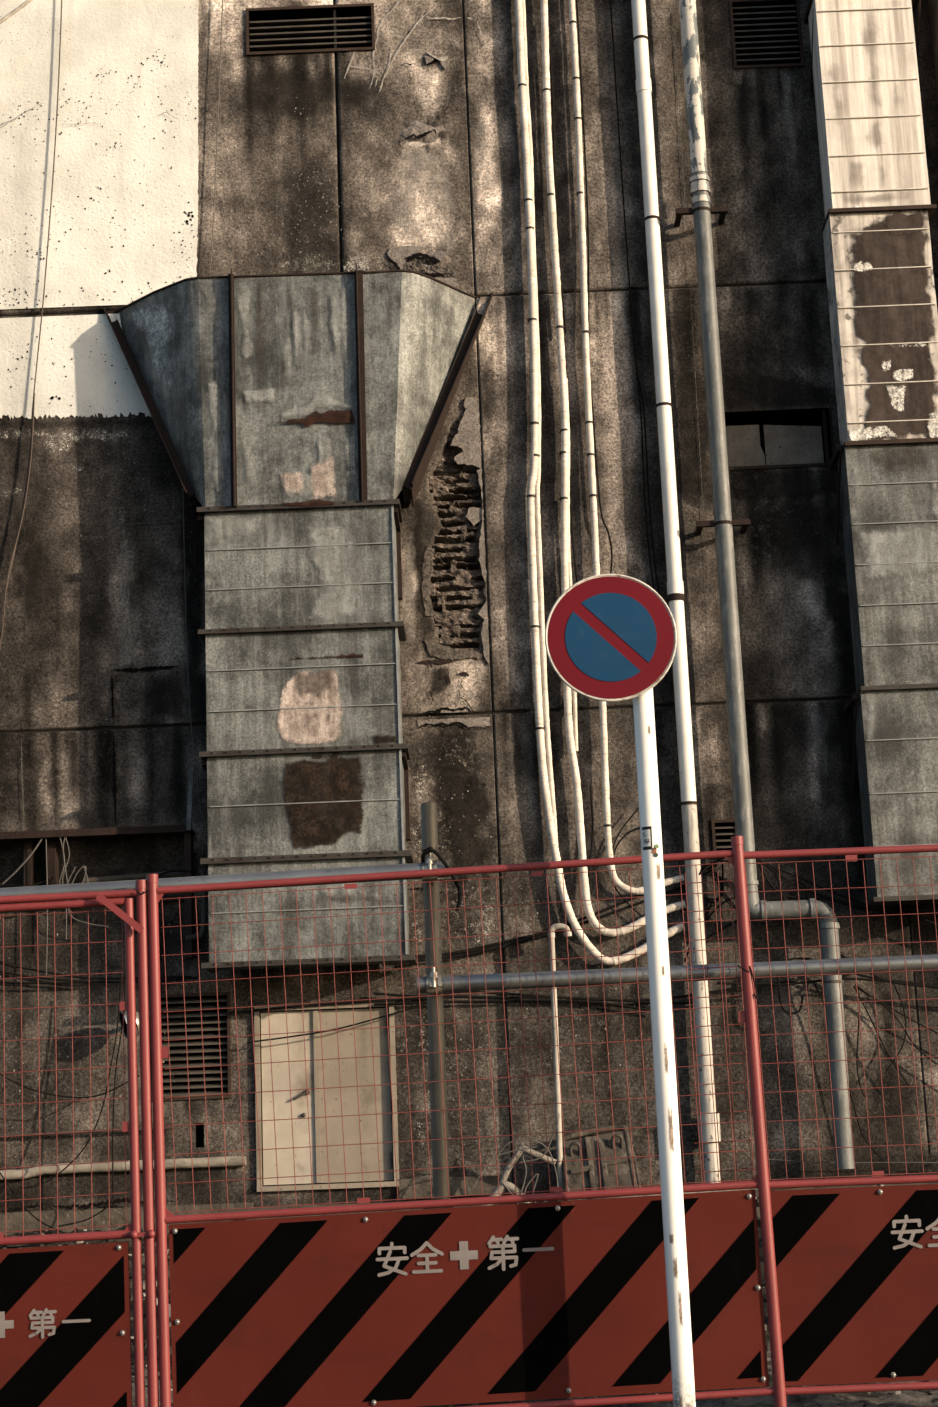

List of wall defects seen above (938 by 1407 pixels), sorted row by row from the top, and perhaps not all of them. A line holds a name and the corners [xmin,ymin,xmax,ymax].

damp [3,49,168,167]
damp [405,113,446,151]
damp [0,174,156,260]
damp [0,202,204,313]
damp [282,159,371,273]
peeling [882,343,925,411]
peeling [849,426,897,441]
peeling [927,412,938,438]
spalling [422,397,490,677]